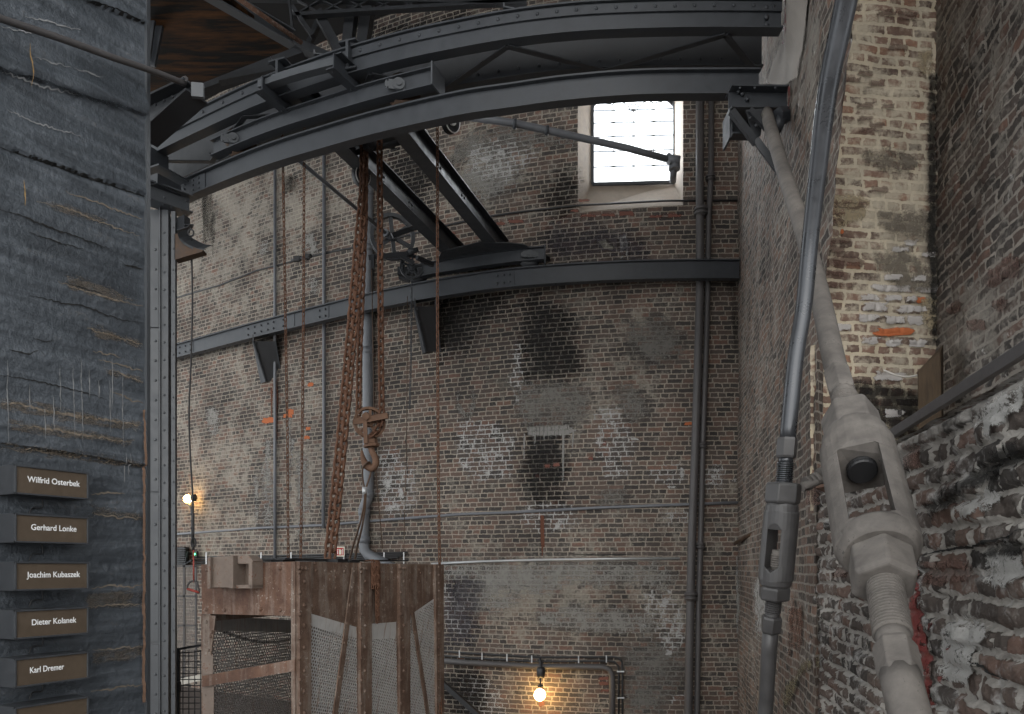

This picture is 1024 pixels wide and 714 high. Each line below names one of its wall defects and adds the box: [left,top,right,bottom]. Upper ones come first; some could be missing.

crack [0,209,141,269]
crack [32,283,141,323]
leakage [838,273,938,331]
spalling [873,327,915,337]
leakage [862,337,928,347]
leakage [508,344,524,401]
leakage [885,409,905,418]
leakage [974,383,1023,441]
leakage [457,418,576,480]
leakage [954,487,1004,519]
leakage [982,552,1024,590]
leakage [917,566,986,708]